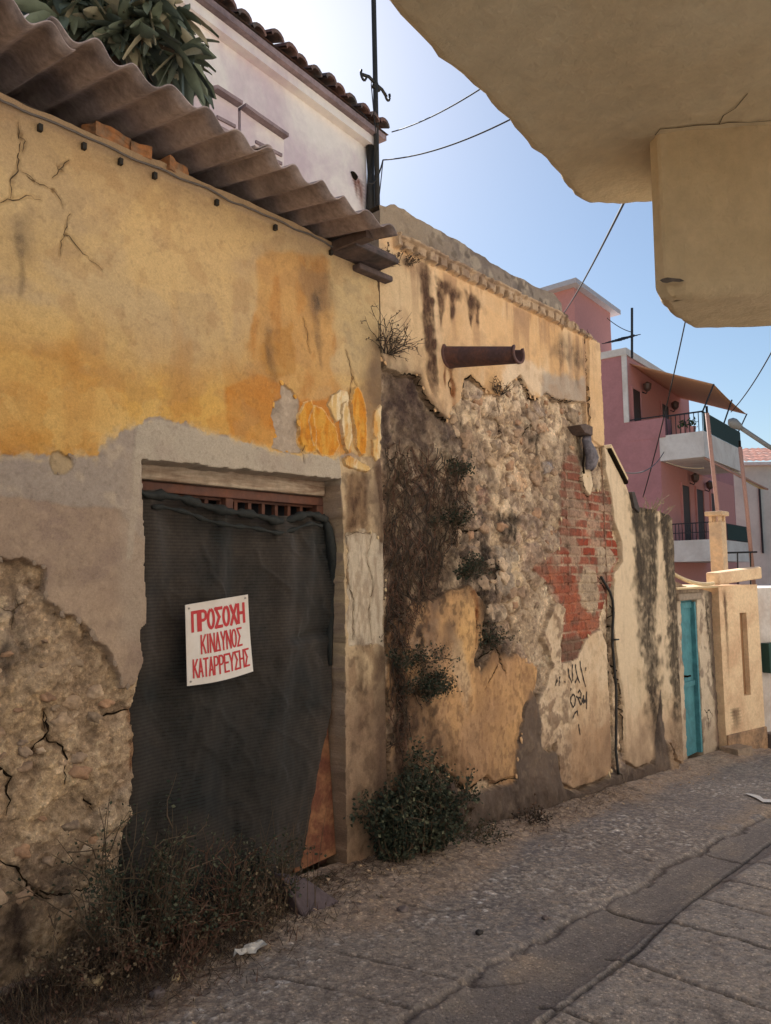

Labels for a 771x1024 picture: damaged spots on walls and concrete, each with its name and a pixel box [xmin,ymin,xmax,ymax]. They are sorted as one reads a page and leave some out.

crack [0,125,99,266]
damp [420,265,479,386]
spalling [271,356,652,814]
damp [632,507,681,720]
crack [0,767,13,814]
crack [31,711,92,809]
spalling [0,557,138,987]